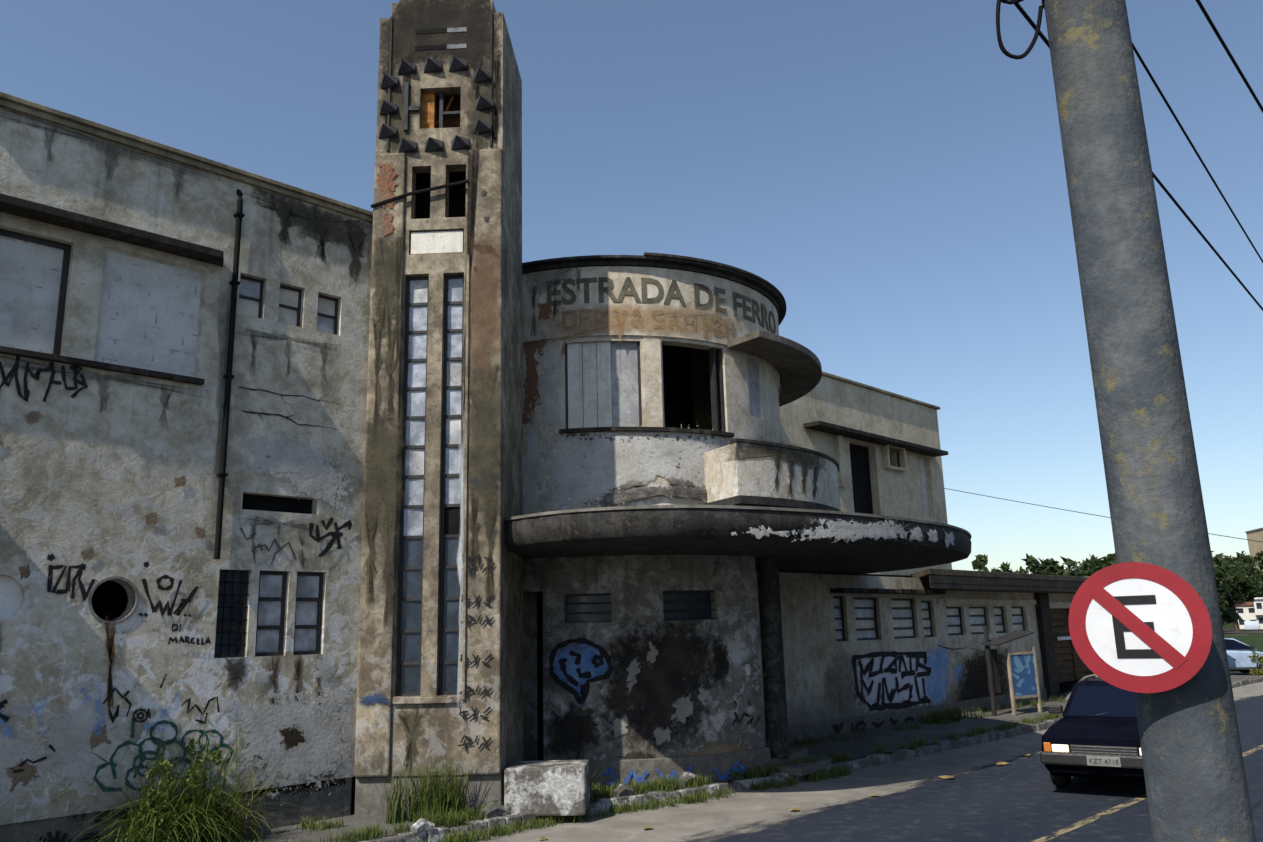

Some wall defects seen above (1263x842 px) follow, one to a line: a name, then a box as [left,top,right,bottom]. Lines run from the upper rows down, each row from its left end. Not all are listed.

crack [239,386,340,430]
water stain [256,189,403,624]
peeling [522,340,729,512]
water stain [728,438,822,497]
peeling [731,518,955,548]
rust [105,622,115,708]
peeling [613,714,629,738]
water stain [547,618,729,760]
peeling [626,641,659,693]
peeling [653,683,709,745]